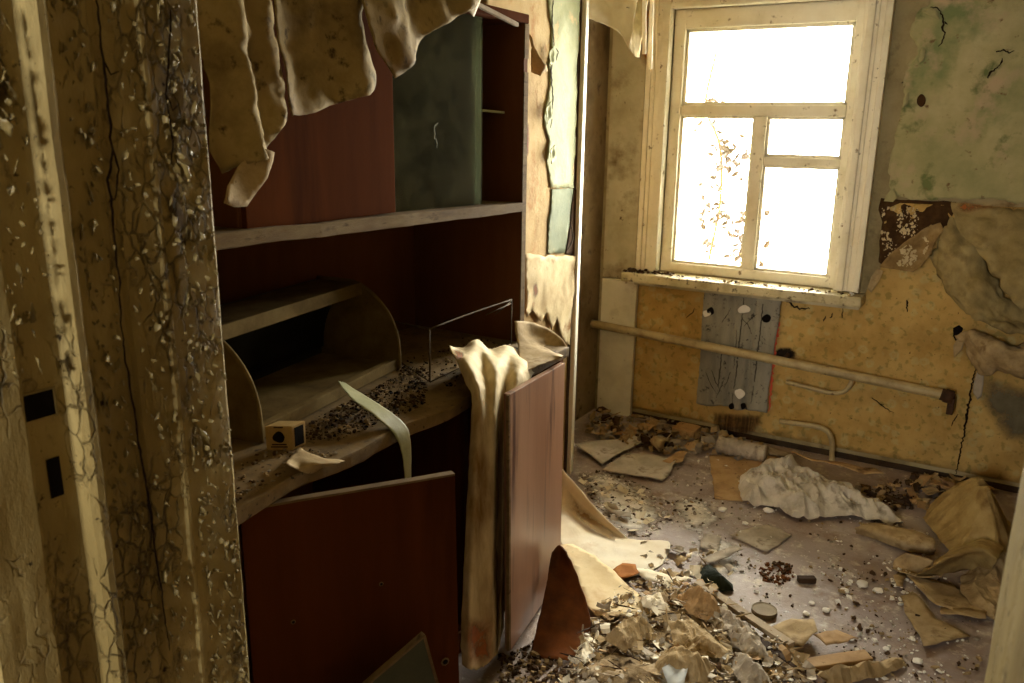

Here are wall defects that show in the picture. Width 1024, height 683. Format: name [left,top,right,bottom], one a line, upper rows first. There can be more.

crack [932,7,948,47]
crack [987,49,1013,78]
crack [95,0,170,650]
crack [951,367,977,474]